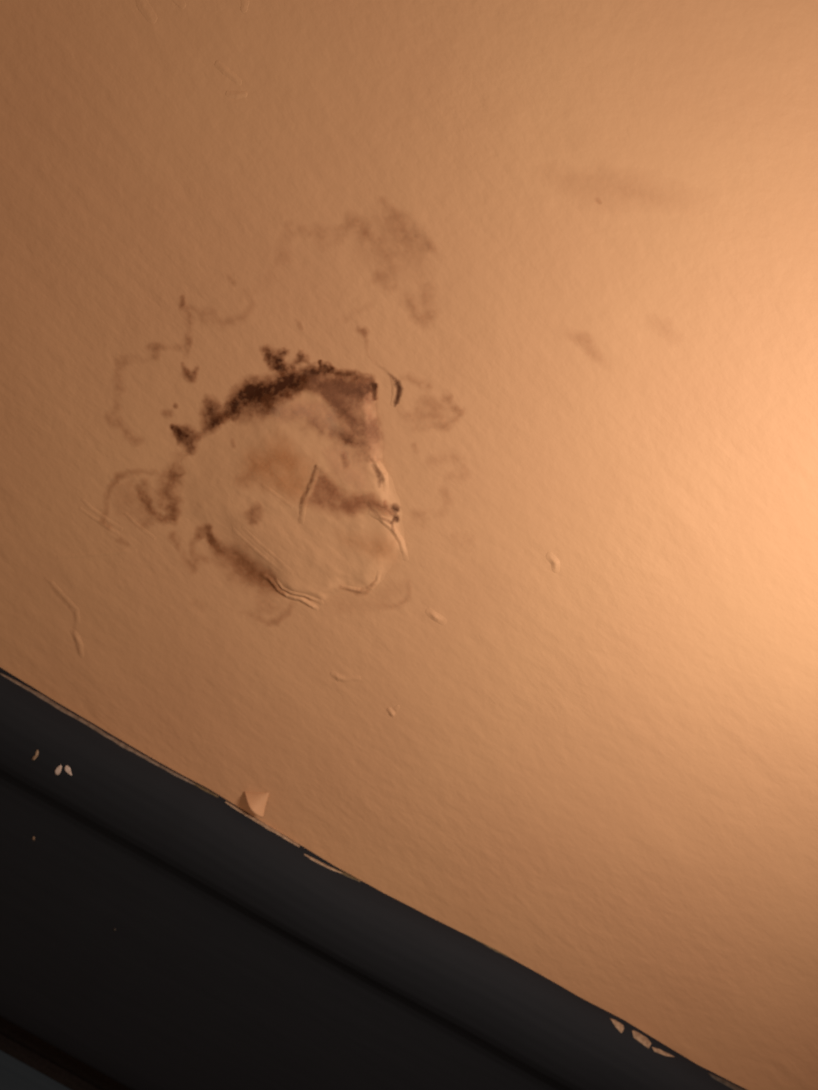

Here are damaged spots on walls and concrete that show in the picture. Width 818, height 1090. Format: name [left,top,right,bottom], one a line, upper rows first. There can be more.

leakage [204,349,378,444]
mould [171,425,194,452]
leakage [206,526,223,552]
peeling [0,673,361,882]
peeling [610,1018,674,1057]